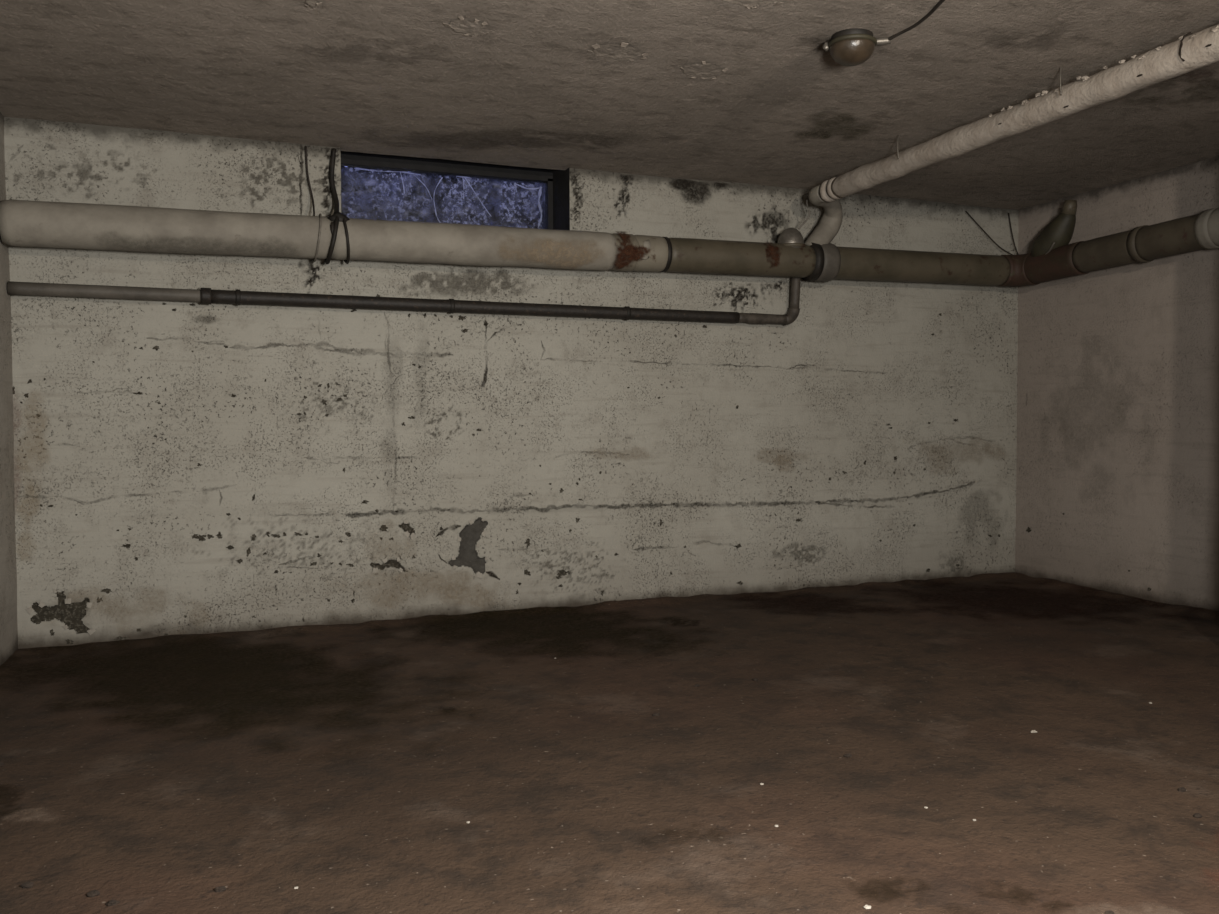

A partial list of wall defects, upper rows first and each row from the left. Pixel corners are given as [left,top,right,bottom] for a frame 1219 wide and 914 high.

corrosion [614,231,650,269]
crack [599,501,702,509]
spalling [436,517,500,580]
spalling [26,588,112,644]